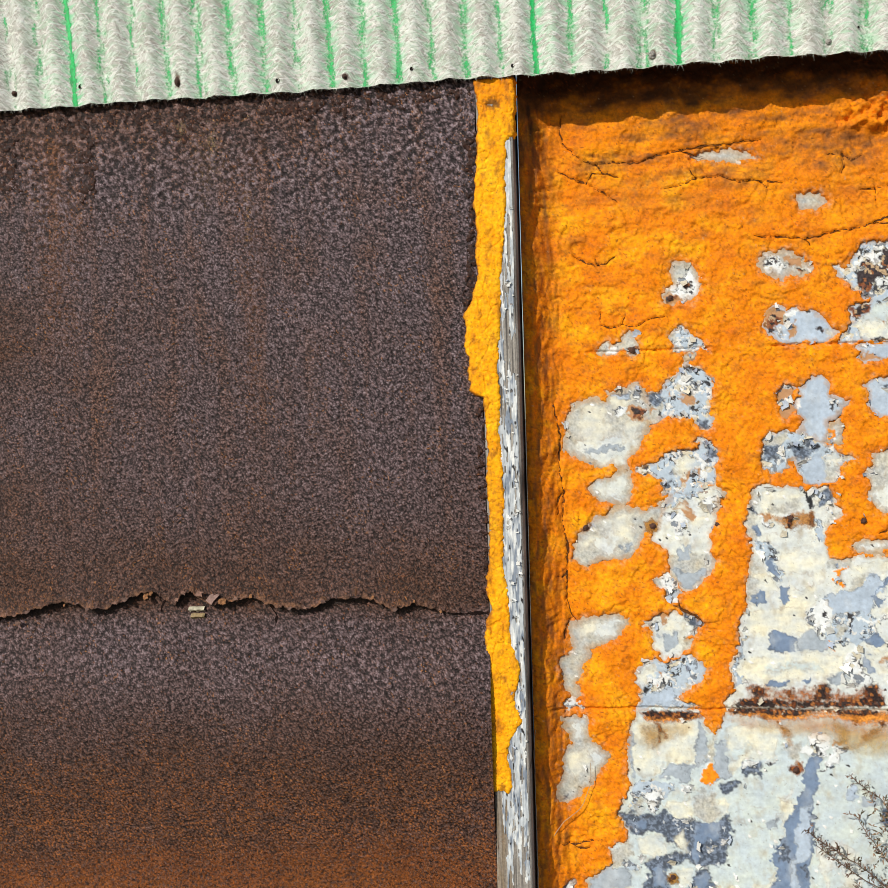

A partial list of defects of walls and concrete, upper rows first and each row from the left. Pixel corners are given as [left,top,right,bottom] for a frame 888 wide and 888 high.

crack [558,119,782,202]
crack [827,152,861,172]
crack [755,185,888,245]
crack [575,257,615,267]
peeling [661,261,702,306]
peeling [756,240,888,364]
peeling [497,140,530,888]
crack [0,590,489,626]
peeling [556,325,888,888]
rust [642,709,703,742]
rust [728,684,888,738]
rust [0,844,491,888]